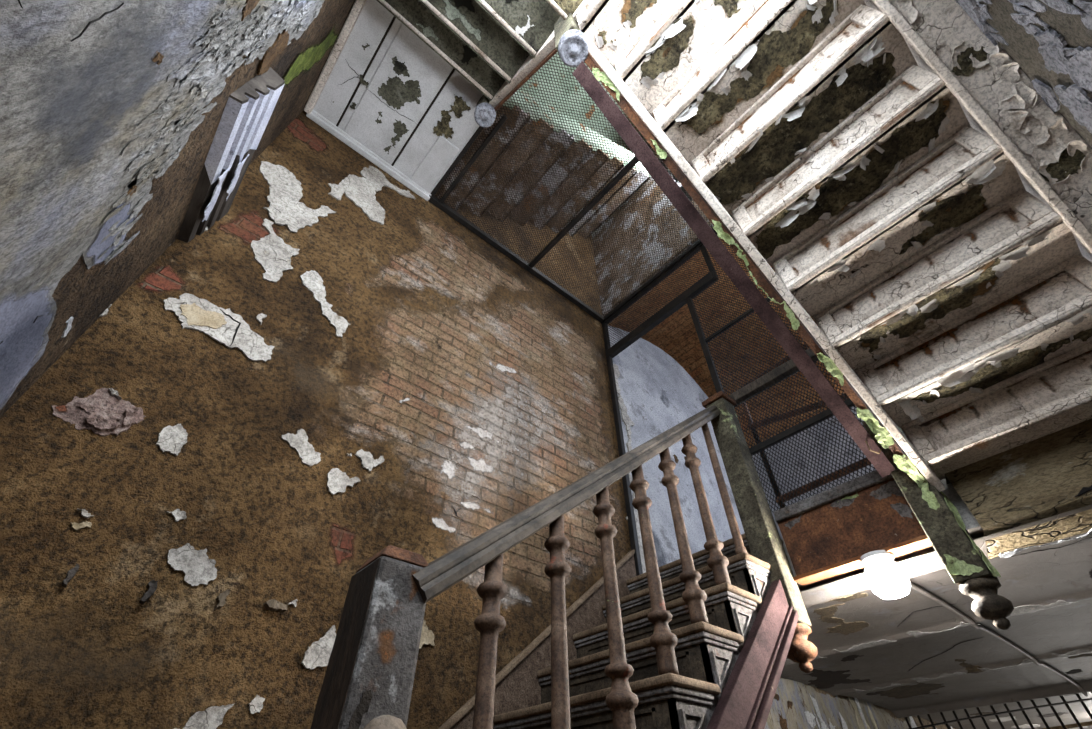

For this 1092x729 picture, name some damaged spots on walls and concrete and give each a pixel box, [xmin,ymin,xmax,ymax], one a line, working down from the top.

crack [70,3,124,42]
peeling [620,0,657,30]
peeling [639,15,695,89]
peeling [679,0,838,135]
crack [894,0,918,24]
peeling [1008,0,1092,134]
crack [935,37,1092,197]
peeling [0,0,422,410]
flaking render [156,424,188,456]
peeling [830,407,1092,577]
flaking render [167,543,217,587]
flaking render [301,625,336,670]